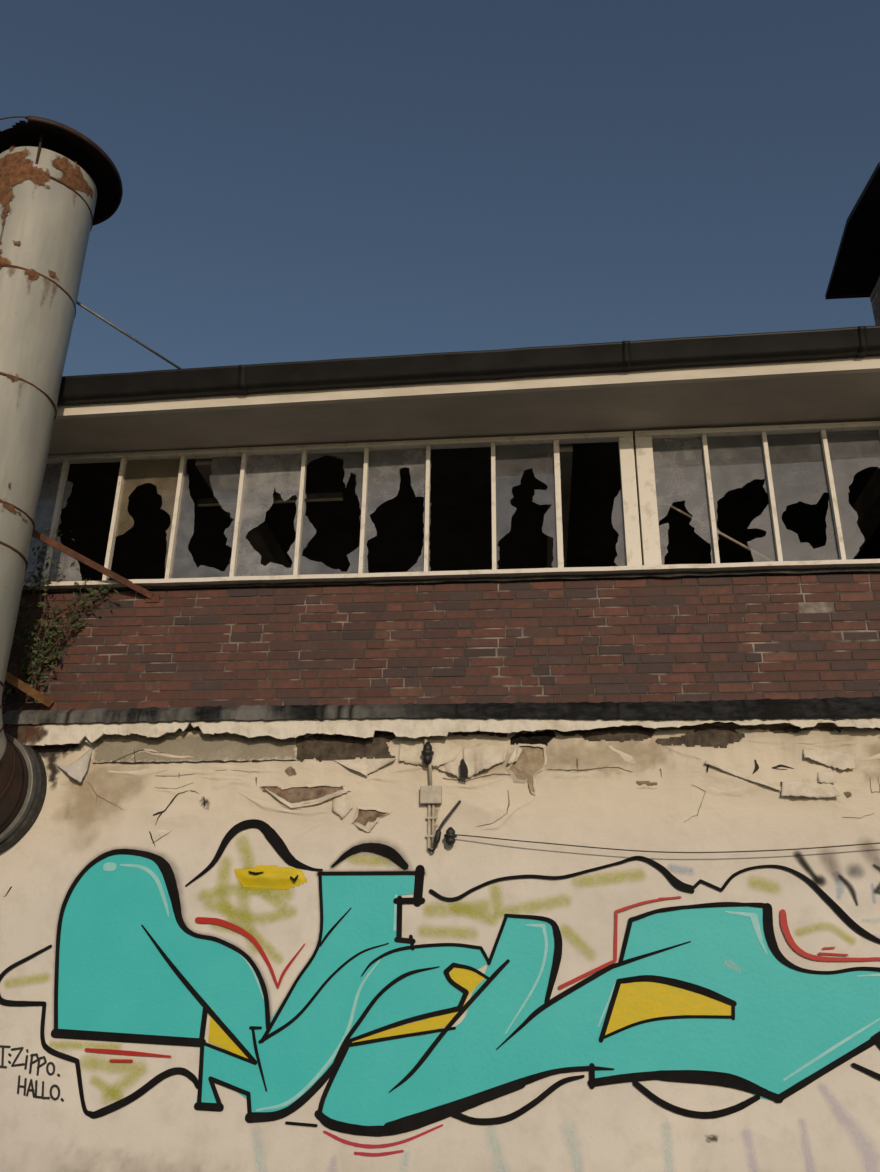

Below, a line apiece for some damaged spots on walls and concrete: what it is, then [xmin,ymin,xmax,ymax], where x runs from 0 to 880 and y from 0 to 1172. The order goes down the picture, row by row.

rust [0,146,93,225]
rust [0,240,59,291]
spalling [768,722,841,733]
peeling [56,737,92,782]
spalling [260,722,745,832]
peeling [705,749,856,799]